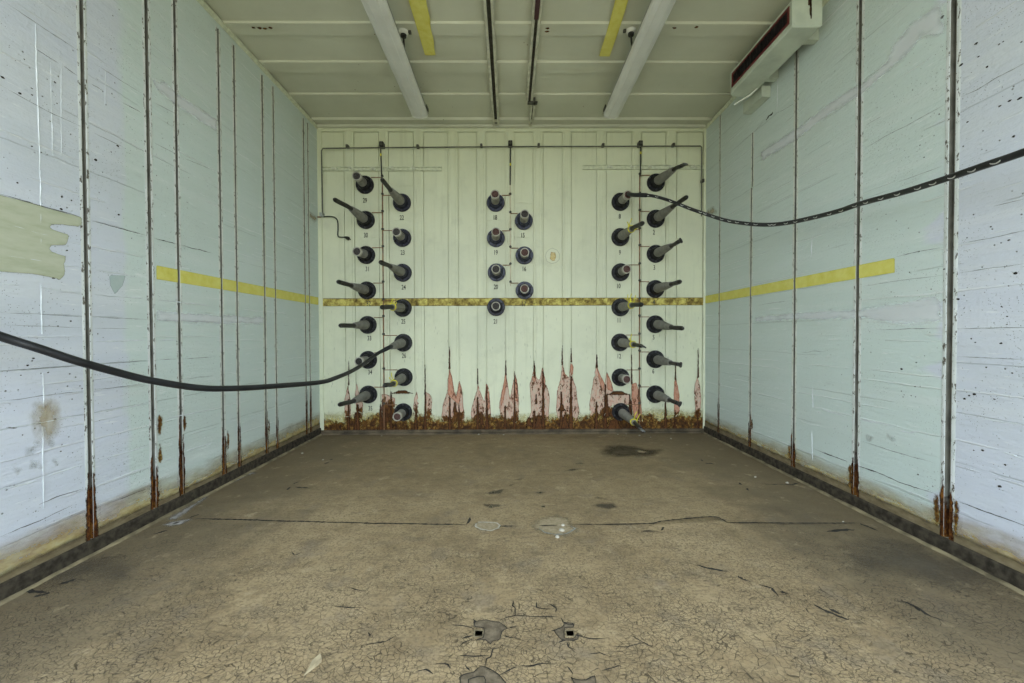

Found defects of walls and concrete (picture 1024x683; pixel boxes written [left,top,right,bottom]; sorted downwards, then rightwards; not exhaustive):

peeling [344,363,364,430]
rust [306,389,703,434]
peeling [379,346,643,436]
peeling [664,366,681,429]
rust [150,415,162,510]
rust [179,416,187,496]
rust [85,472,99,542]
crack [190,514,471,525]
rust [933,483,959,541]
crack [418,601,652,675]
spalling [459,666,506,683]
spalling [571,675,596,683]